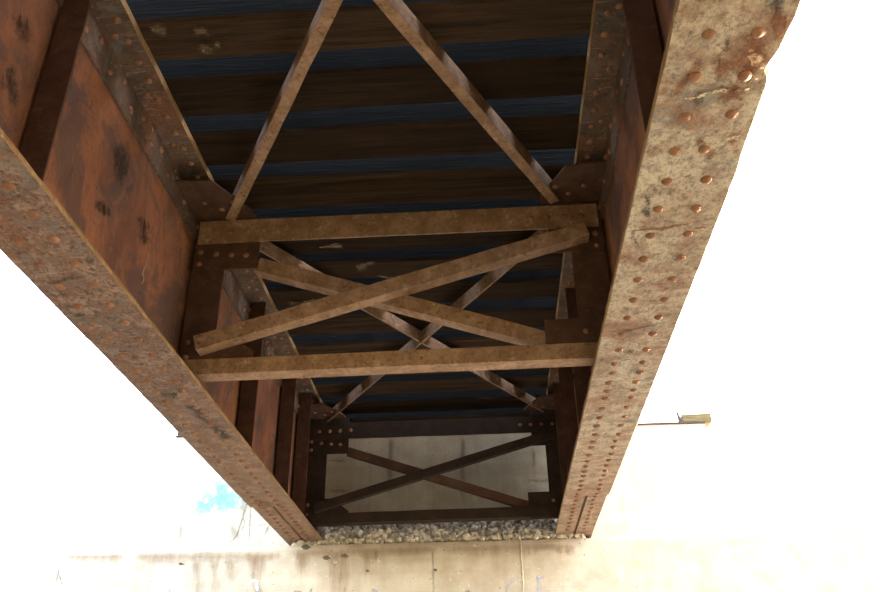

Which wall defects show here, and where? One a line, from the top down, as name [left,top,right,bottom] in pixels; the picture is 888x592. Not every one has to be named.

corrosion [714,35,766,100]
peeling [745,53,769,90]